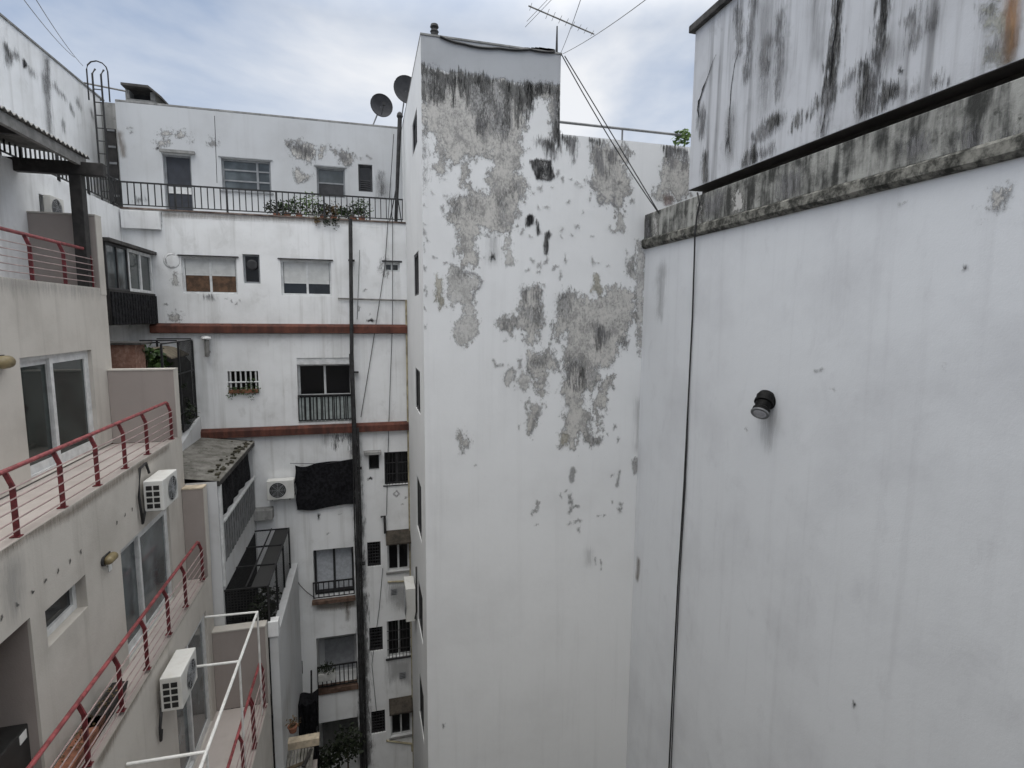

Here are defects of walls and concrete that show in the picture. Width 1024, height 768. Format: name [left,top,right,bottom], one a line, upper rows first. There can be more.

water stain [906,6,938,49]
peeling [284,138,371,183]
water stain [421,64,576,161]
peeling [651,154,692,205]
water stain [696,105,747,224]
water stain [733,0,914,167]
peeling [421,69,645,451]